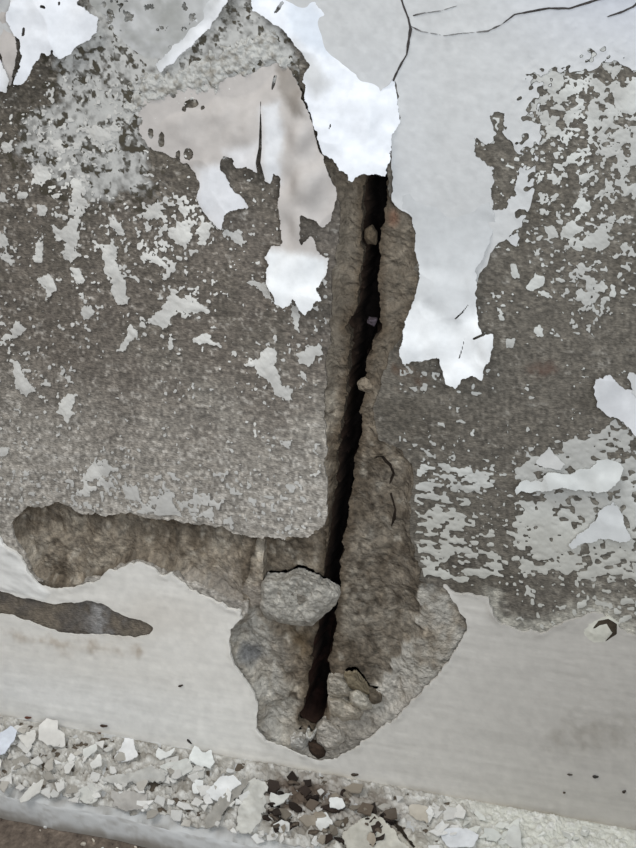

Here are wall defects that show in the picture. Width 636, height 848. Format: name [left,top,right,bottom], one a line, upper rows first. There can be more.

peeling [0,591,153,637]
peeling [0,0,401,619]
crack [300,169,396,723]
peeling [230,55,636,760]
crack [393,0,636,81]
peeling [580,46,606,62]